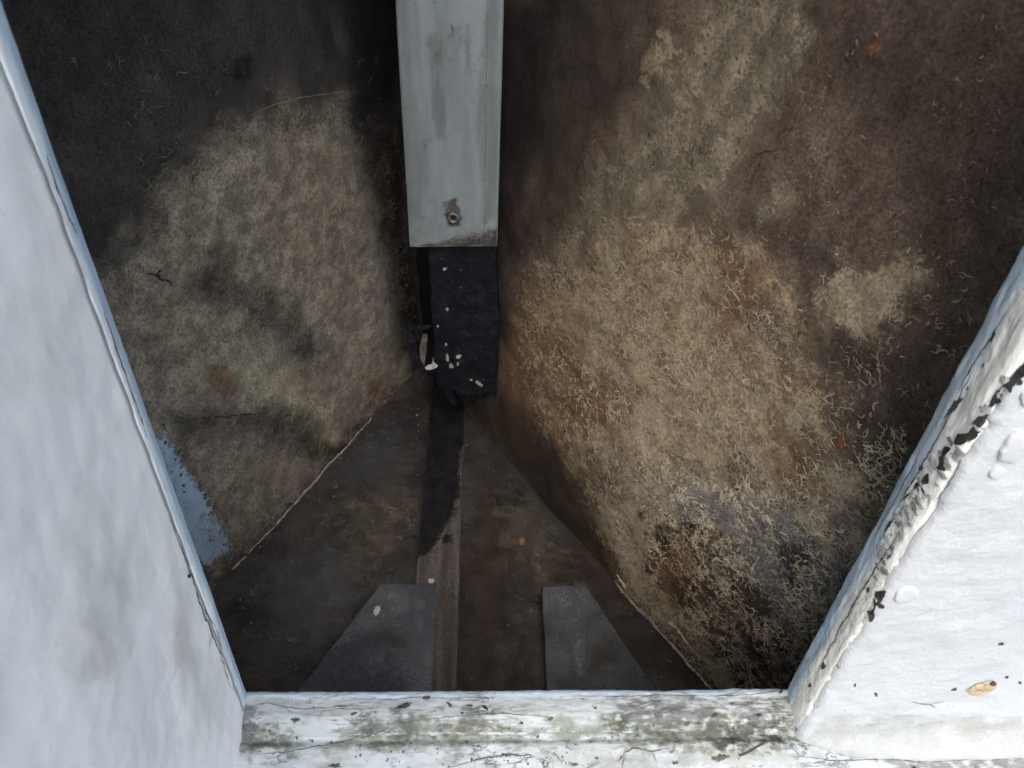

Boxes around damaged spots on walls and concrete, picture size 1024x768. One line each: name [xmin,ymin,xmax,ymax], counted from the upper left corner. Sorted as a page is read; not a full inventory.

leakage [99,0,436,591]
leakage [465,0,889,690]
flaking render [866,375,1010,602]